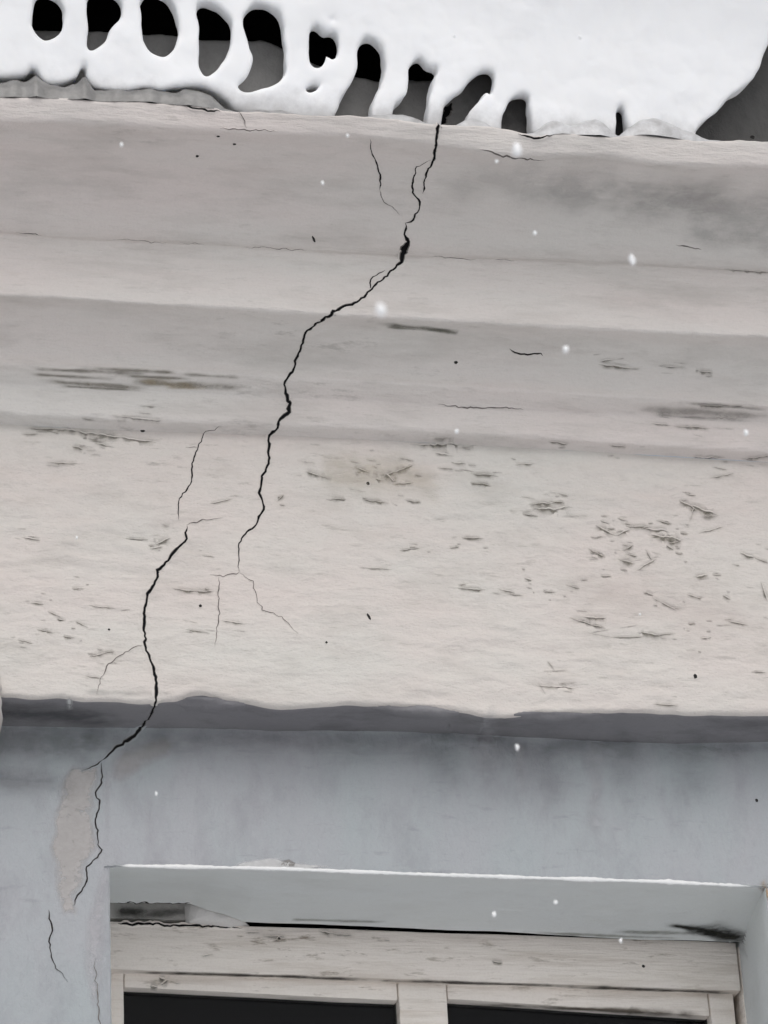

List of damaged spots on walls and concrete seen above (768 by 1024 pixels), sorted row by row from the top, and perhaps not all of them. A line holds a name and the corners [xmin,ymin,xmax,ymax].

crack [210,103,524,644]
peeling [525,500,573,516]
peeling [596,493,723,554]
peeling [588,544,656,571]
peeling [569,616,675,638]
crack [46,425,223,982]
crack [118,900,243,930]